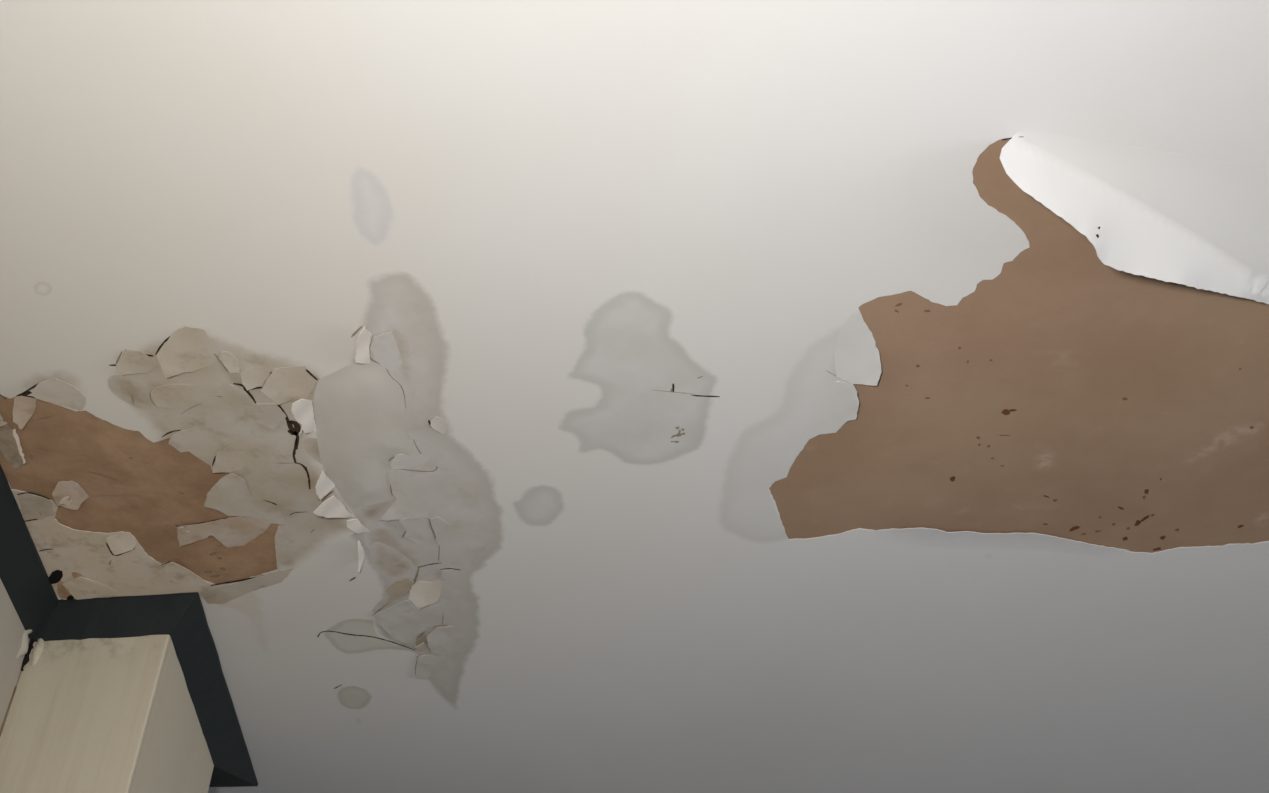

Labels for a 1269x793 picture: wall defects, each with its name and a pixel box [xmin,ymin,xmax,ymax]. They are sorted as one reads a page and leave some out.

spalling [16,629,44,671]
damp [13,367,89,410]
damp [8,482,273,656]
peeling [0,326,370,604]
damp [103,268,568,714]
peeling [351,326,406,408]
peeling [372,439,461,679]
damp [554,288,722,468]
peeling [769,131,1269,557]